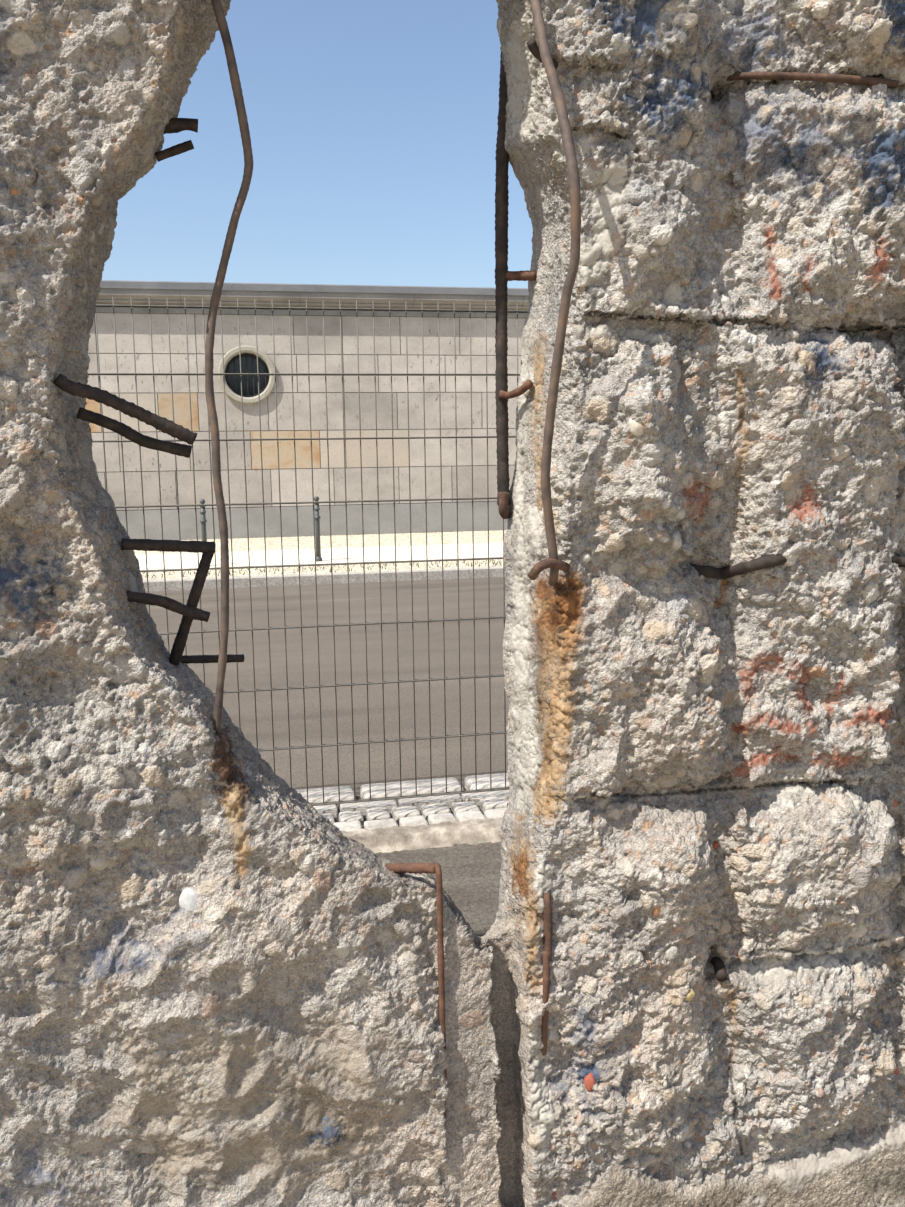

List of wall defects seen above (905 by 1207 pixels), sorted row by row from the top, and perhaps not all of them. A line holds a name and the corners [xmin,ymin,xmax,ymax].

spalling [53,0,253,733]
rust [213,725,251,875]
rust [510,572,586,992]